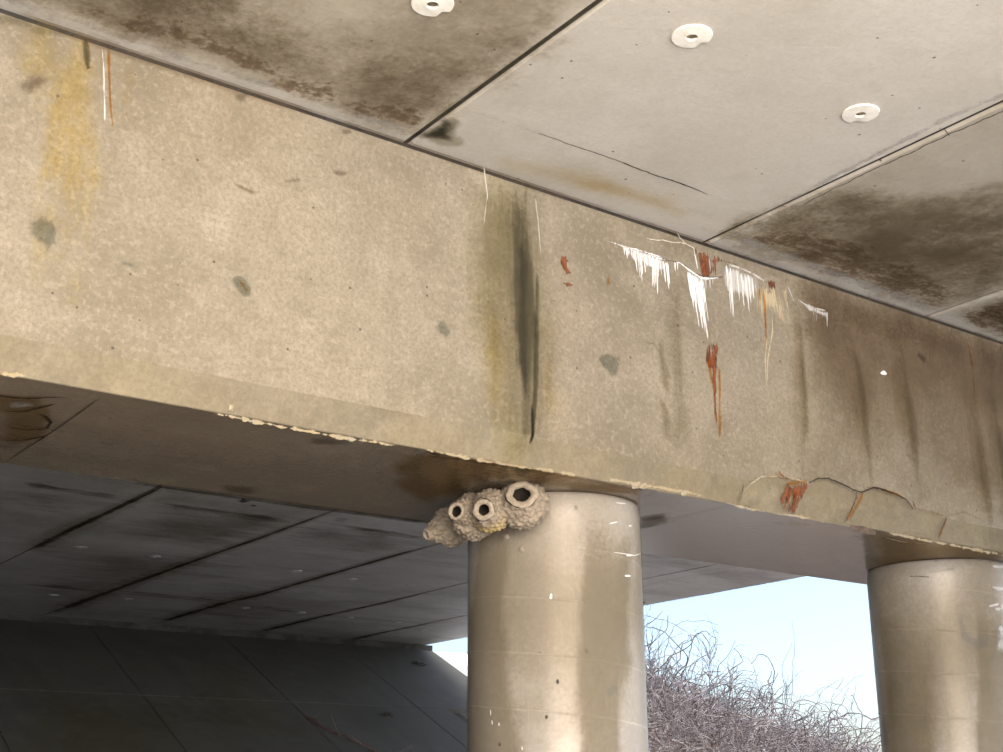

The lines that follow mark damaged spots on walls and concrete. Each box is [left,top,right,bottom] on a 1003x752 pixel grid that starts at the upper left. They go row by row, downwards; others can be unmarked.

damp [612,242,828,379]
rust [706,344,718,422]
spalling [218,405,390,446]
spalling [428,449,575,476]
spalling [610,479,701,496]
rust [779,471,807,513]
spalling [891,533,1003,569]